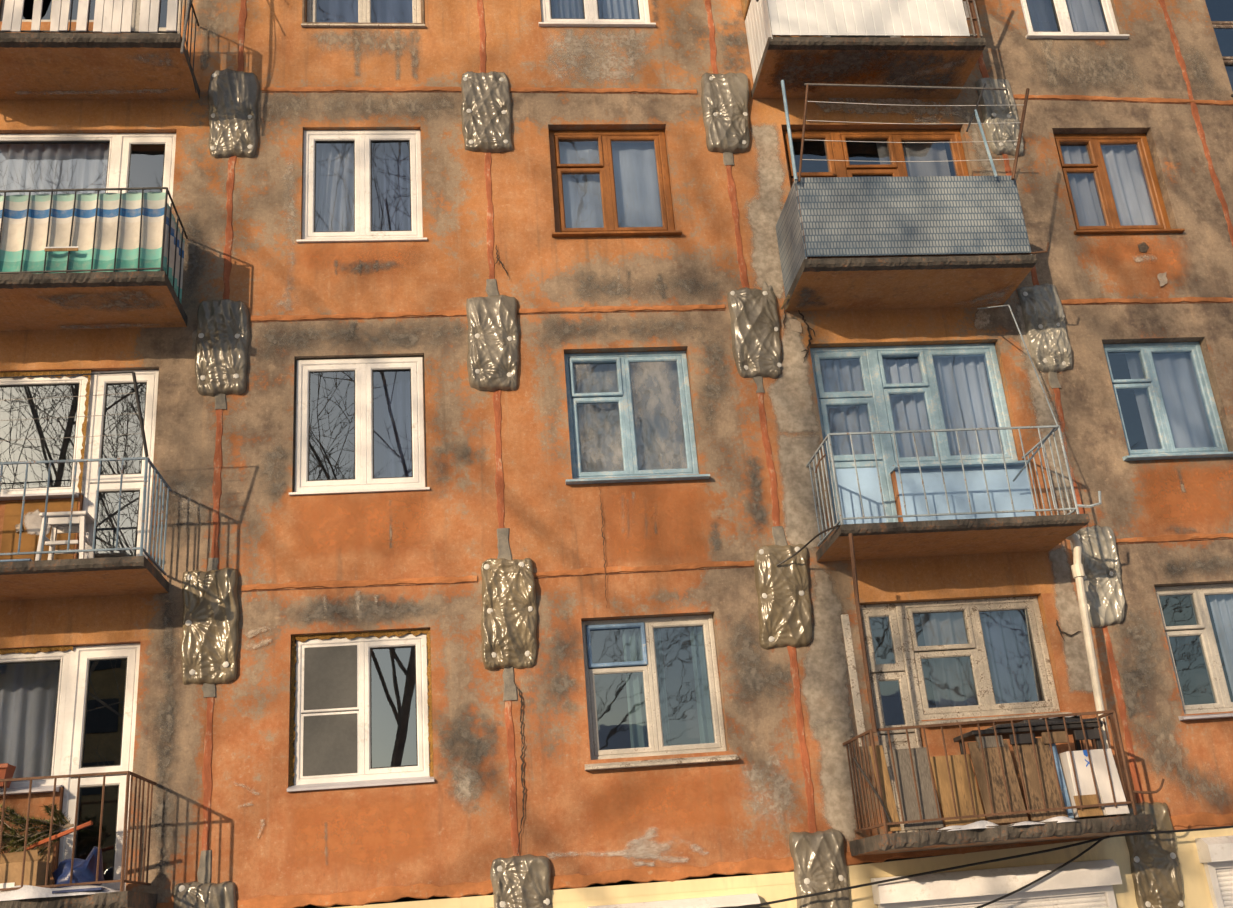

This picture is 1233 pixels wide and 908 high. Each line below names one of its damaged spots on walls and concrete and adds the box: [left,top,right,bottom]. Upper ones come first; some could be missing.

damp [315,30,418,80]
damp [170,478,204,533]
flaking render [802,569,861,841]
damp [151,672,176,876]
damp [449,717,494,797]
crack [513,680,526,853]
peeling [602,830,706,866]